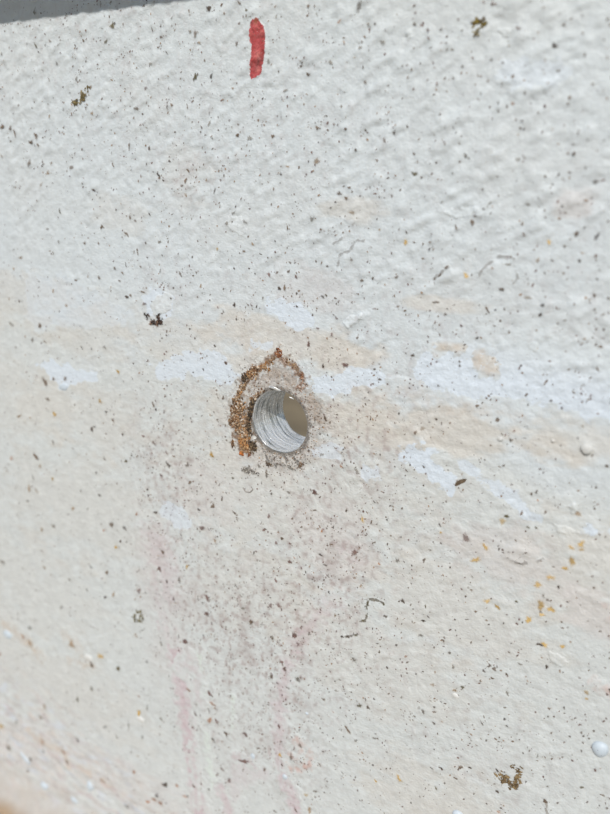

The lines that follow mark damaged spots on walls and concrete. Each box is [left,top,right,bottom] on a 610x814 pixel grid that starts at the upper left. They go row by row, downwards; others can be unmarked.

rust [222,342,338,479]